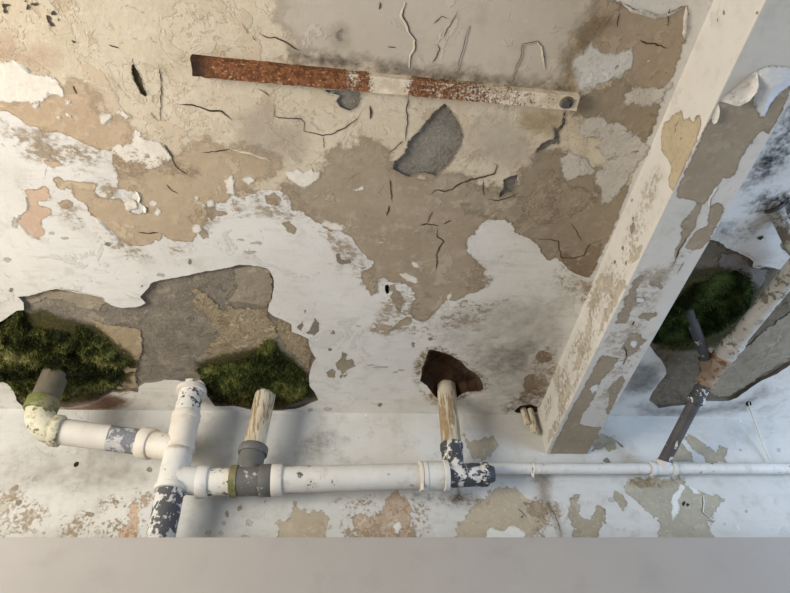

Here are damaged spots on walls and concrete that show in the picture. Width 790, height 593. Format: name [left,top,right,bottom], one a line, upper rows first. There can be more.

crack [242,24,298,50]
crack [432,13,470,70]
crack [259,89,372,147]
crack [389,96,409,153]
crack [431,164,517,201]
leakage [758,131,790,177]
peeling [0,0,790,463]
peeling [0,477,47,537]
peeling [61,491,152,537]
peeling [275,501,332,537]
peeling [334,490,429,537]
peeling [455,476,725,537]